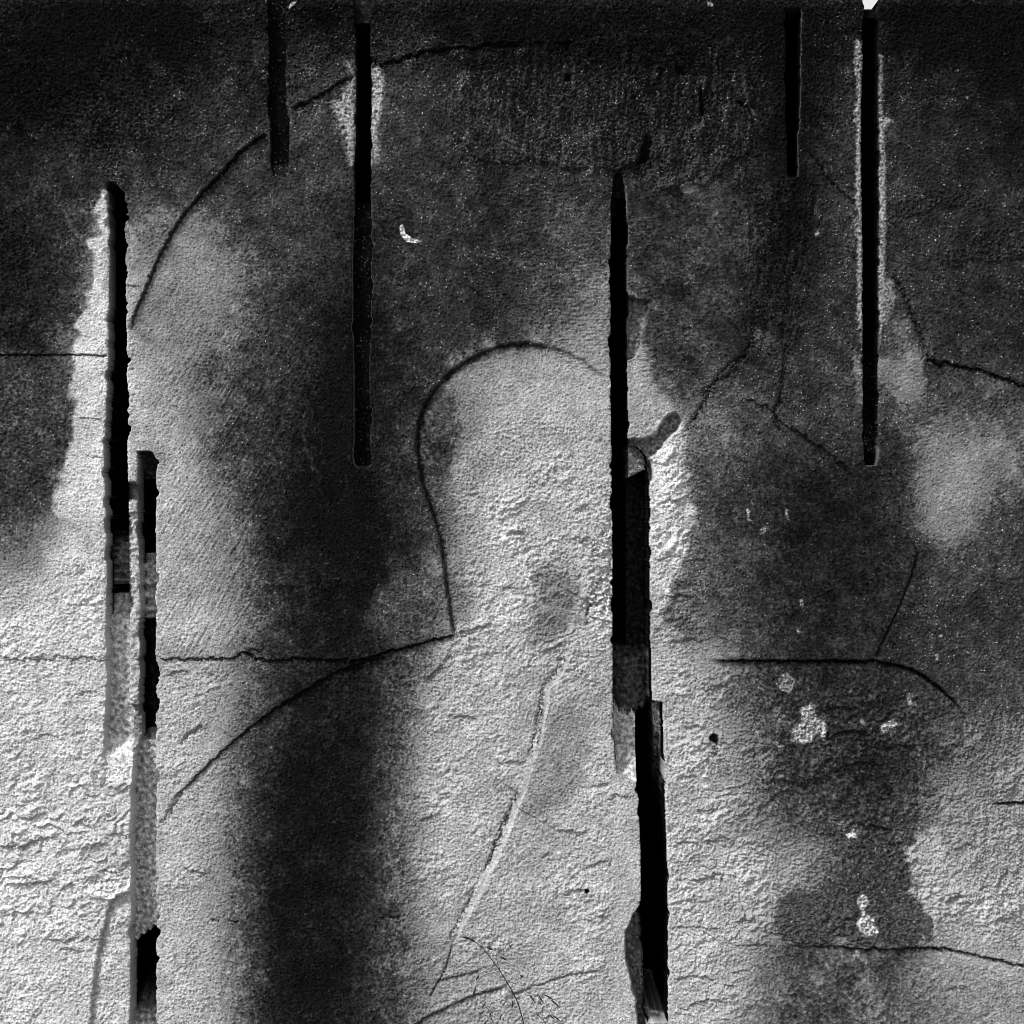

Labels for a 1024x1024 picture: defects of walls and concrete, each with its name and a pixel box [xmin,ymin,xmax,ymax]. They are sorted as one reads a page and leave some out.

crack [2,351,109,359]
damp [0,0,263,551]
crack [128,132,268,331]
crack [892,275,1024,429]
crack [350,341,610,668]
crack [156,648,315,664]
damp [220,185,458,1024]
damp [702,416,964,834]
crack [157,724,257,827]
crack [415,634,606,1024]
crack [671,926,1024,969]
damp [765,944,937,1024]